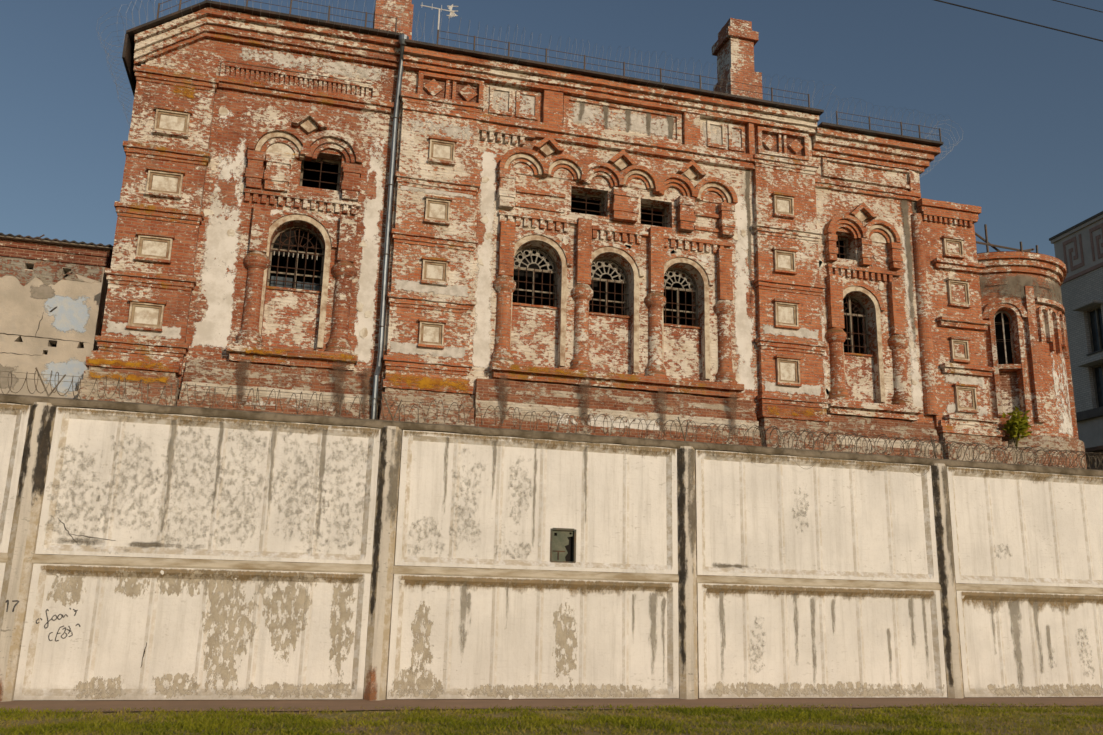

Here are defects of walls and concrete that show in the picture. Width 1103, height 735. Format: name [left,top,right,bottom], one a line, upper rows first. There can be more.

peeling [239,47,389,83]
peeling [106,321,181,339]
peeling [746,286,819,340]
peeling [764,381,830,396]
damp [31,359,379,530]
damp [388,430,675,542]
damp [688,449,1103,577]
peeling [112,569,356,699]
peeling [389,601,443,698]
peeling [458,602,658,700]
damp [1009,601,1023,691]
damp [1033,602,1052,672]